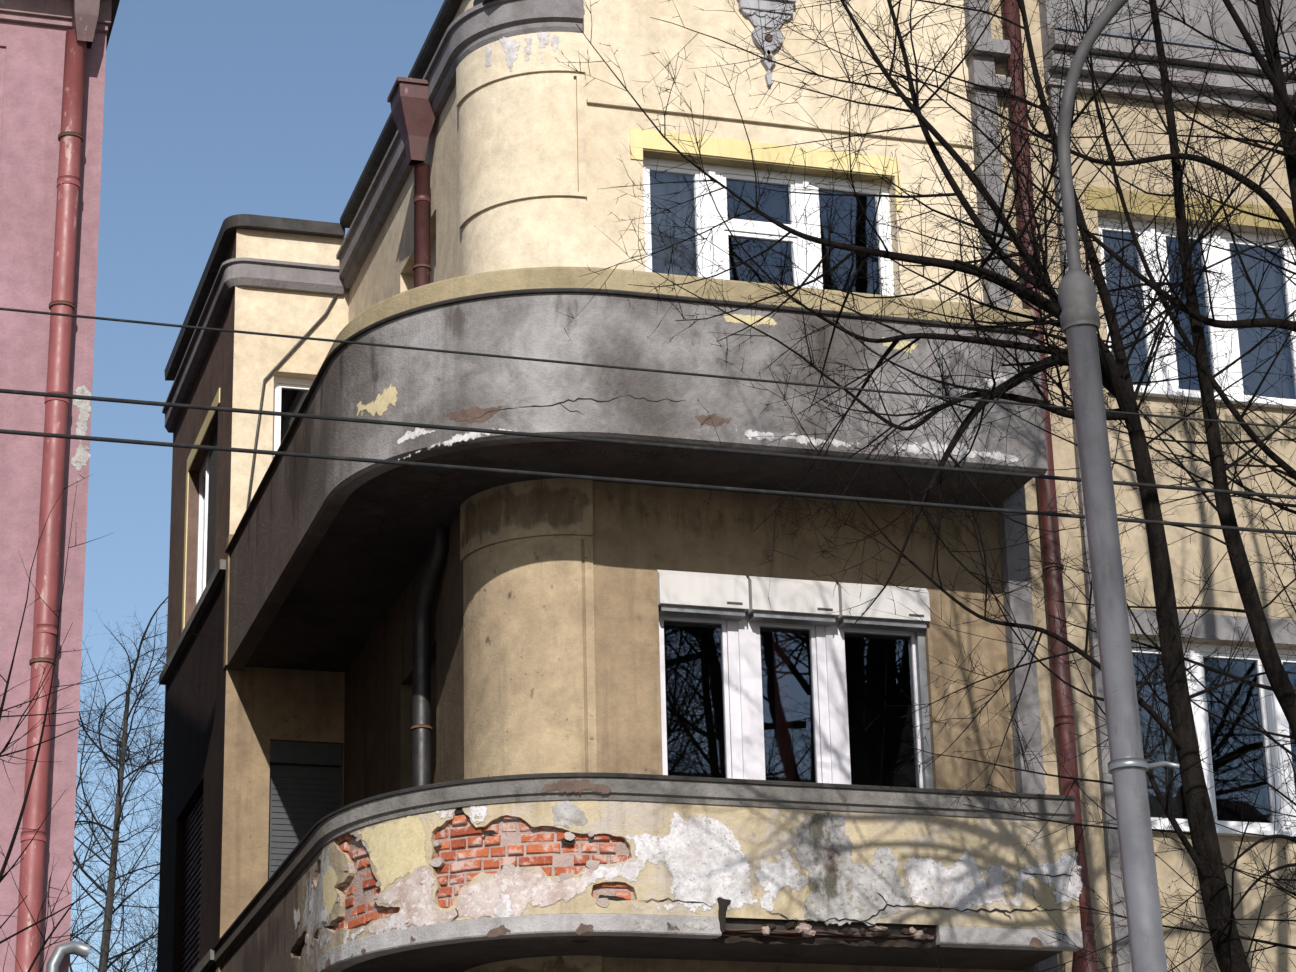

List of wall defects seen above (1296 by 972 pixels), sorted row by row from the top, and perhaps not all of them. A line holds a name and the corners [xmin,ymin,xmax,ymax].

peeling [485,32,559,71]
spalling [443,406,502,423]
crack [474,395,684,419]
peeling [397,427,435,444]
spalling [294,800,1082,972]